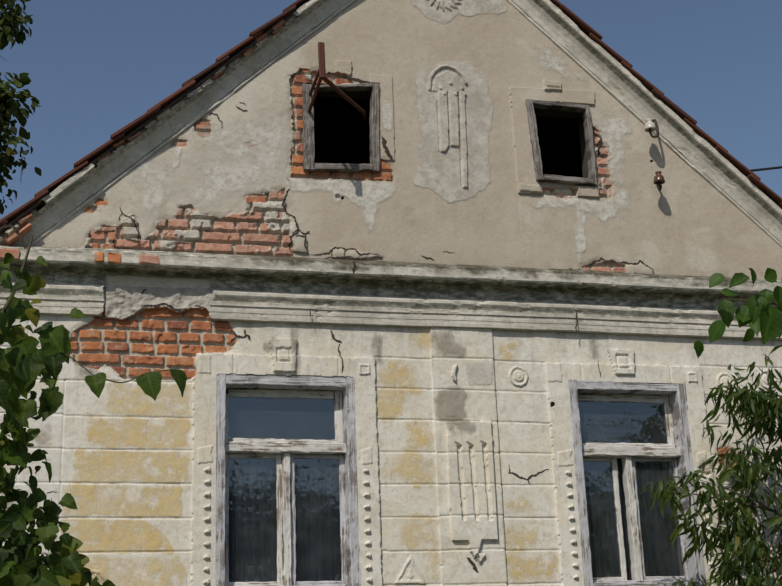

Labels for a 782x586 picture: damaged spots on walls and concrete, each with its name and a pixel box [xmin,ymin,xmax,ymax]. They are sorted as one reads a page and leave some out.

flaking render [171,139,188,148]
flaking render [194,119,212,137]
flaking render [289,68,393,182]
flaking render [592,126,612,198]
flaking render [84,186,295,257]
flaking render [582,260,627,273]
crack [331,331,344,372]
flaking render [65,285,237,586]
crack [508,464,549,484]